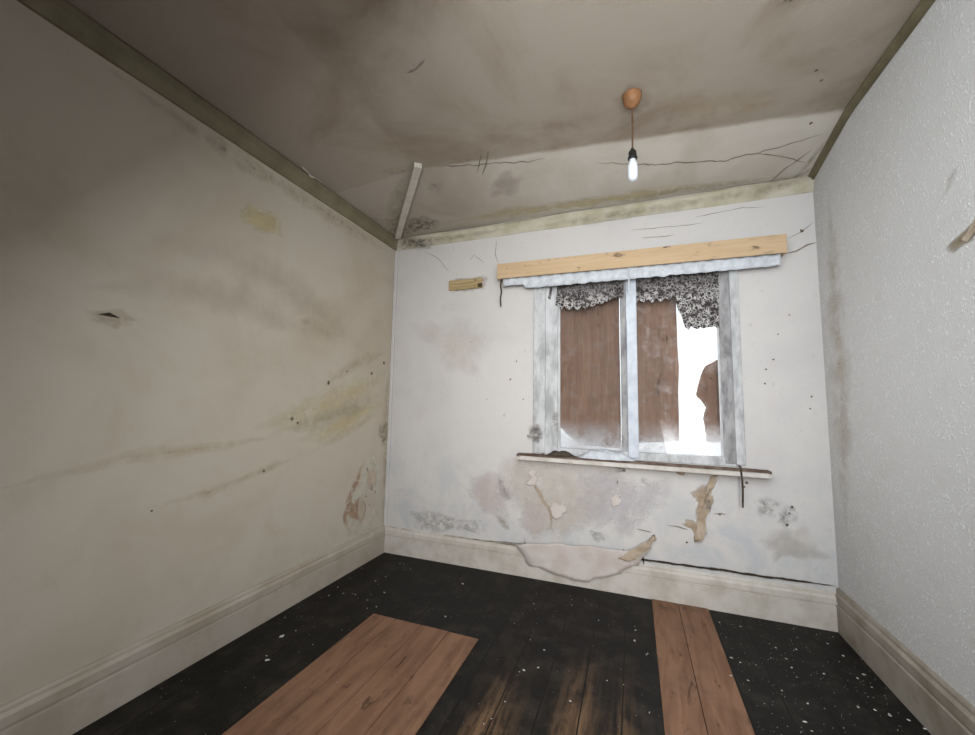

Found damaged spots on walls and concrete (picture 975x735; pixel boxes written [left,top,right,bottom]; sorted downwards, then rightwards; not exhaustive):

crack [437,151,539,175]
crack [601,132,827,166]
crack [636,207,757,238]
crack [785,222,816,254]
peeling [948,218,975,251]
peeling [692,483,716,520]